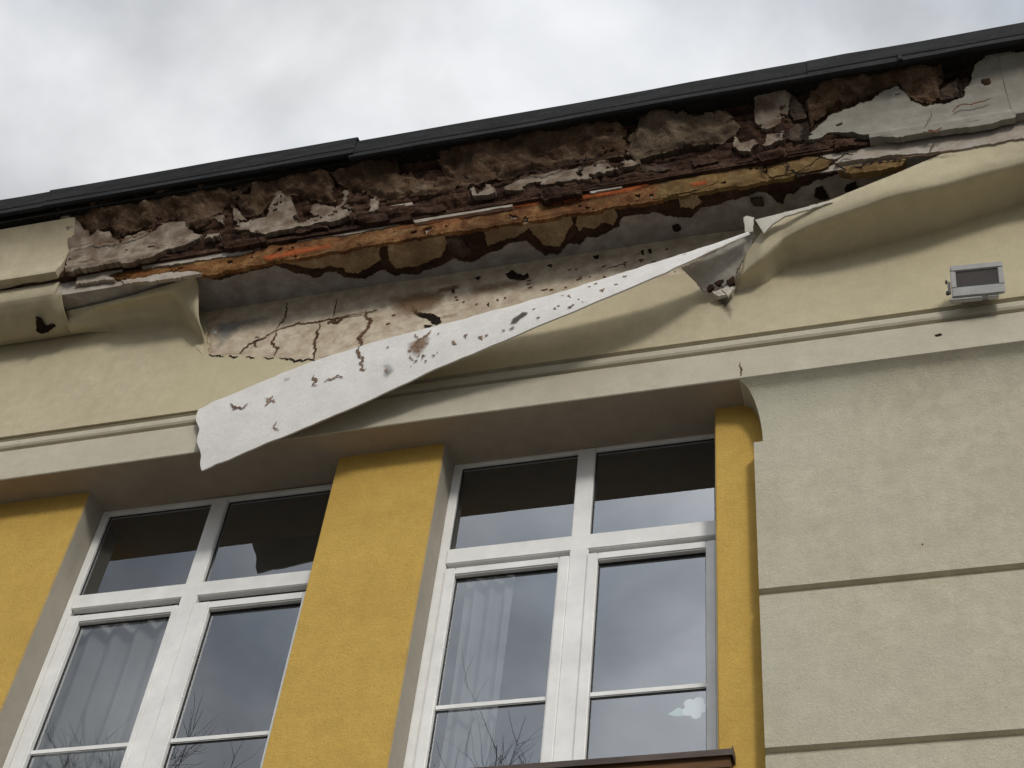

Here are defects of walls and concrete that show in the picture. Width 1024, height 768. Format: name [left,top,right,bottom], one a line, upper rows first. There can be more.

crack [209,300,378,386]
spalling [56,52,1024,472]